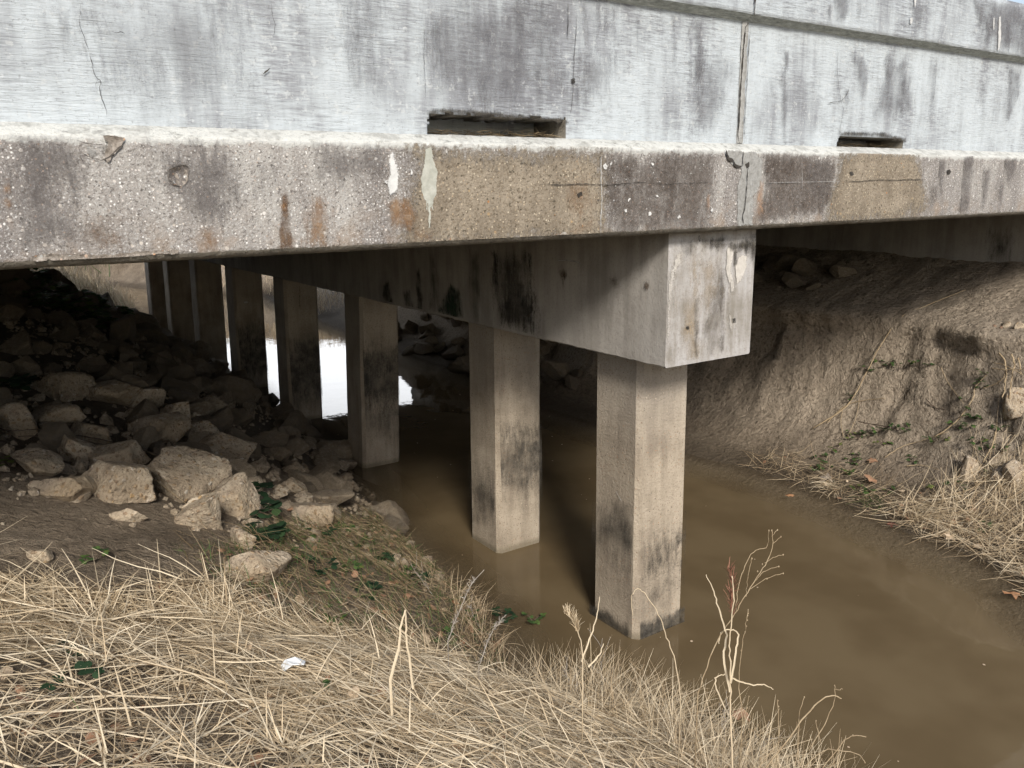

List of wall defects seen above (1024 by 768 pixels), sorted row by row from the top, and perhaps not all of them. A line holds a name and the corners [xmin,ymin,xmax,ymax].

crack [79,11,107,115]
crack [726,0,798,226]
spalling [77,135,125,162]
corrosion [280,195,293,248]
peeling [385,143,613,243]
damp [493,252,536,328]
damp [501,430,542,489]
damp [601,509,632,551]
damp [589,605,685,639]